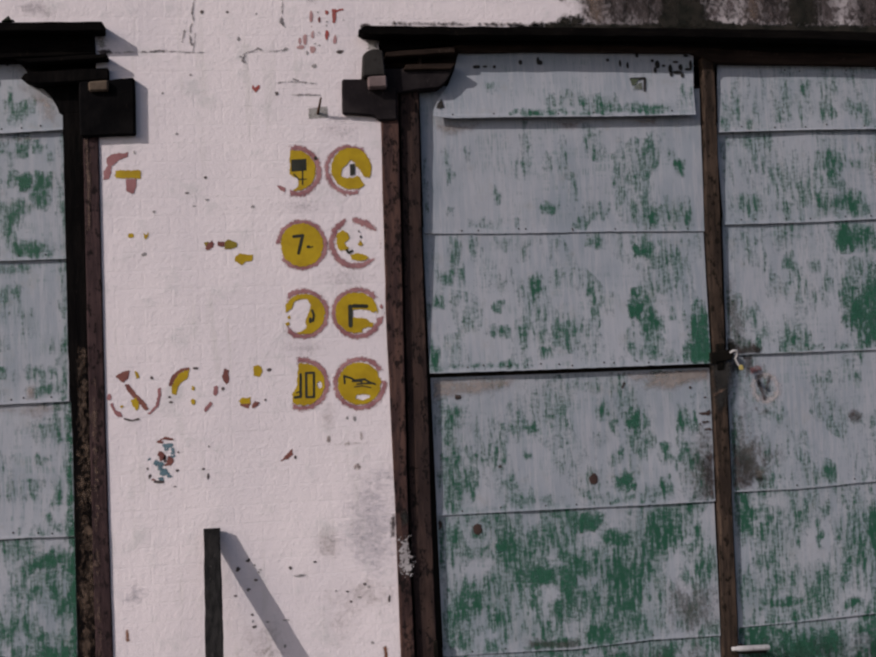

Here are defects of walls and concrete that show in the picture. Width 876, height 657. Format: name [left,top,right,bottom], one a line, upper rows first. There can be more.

leakage [581,0,876,27]
peeling [0,133,66,283]
peeling [0,300,101,657]
peeling [146,437,179,487]
peeling [107,367,229,421]
peeling [239,397,266,408]
peeling [398,536,414,578]
peeling [486,273,613,369]
peeling [435,375,719,657]
peeling [574,134,711,373]
peeling [721,92,876,378]
peeling [730,393,876,657]